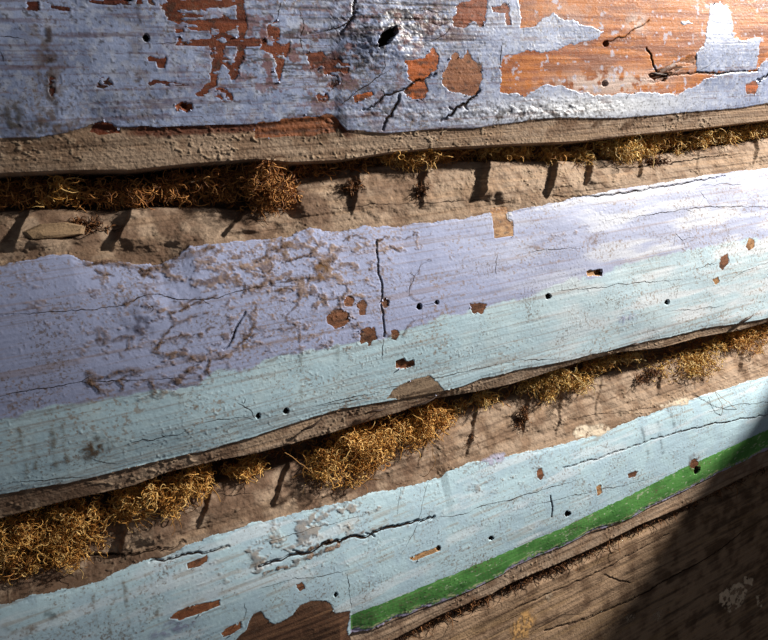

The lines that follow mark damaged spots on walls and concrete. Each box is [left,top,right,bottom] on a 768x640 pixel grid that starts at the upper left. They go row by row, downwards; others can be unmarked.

peeling [89,0,290,113]
crack [331,64,434,128]
crack [440,42,503,121]
peeling [452,0,768,98]
crack [646,49,768,83]
peeling [489,207,514,238]
crack [11,285,255,314]
peeling [326,296,367,329]
crack [376,241,385,356]
crack [259,401,768,567]
peeling [170,600,220,621]
peeling [221,601,350,640]